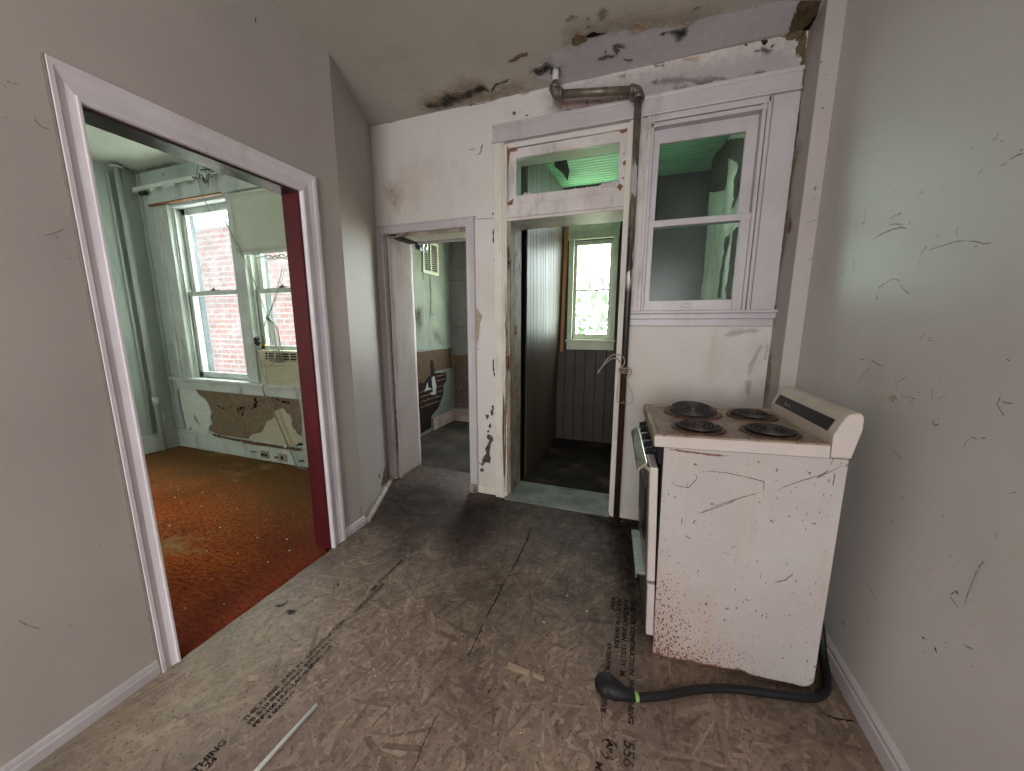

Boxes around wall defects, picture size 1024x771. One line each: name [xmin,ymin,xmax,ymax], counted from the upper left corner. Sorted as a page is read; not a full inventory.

peeling [529,0,802,85]
water stain [426,79,509,107]
peeling [479,248,517,492]
spalling [173,388,304,462]